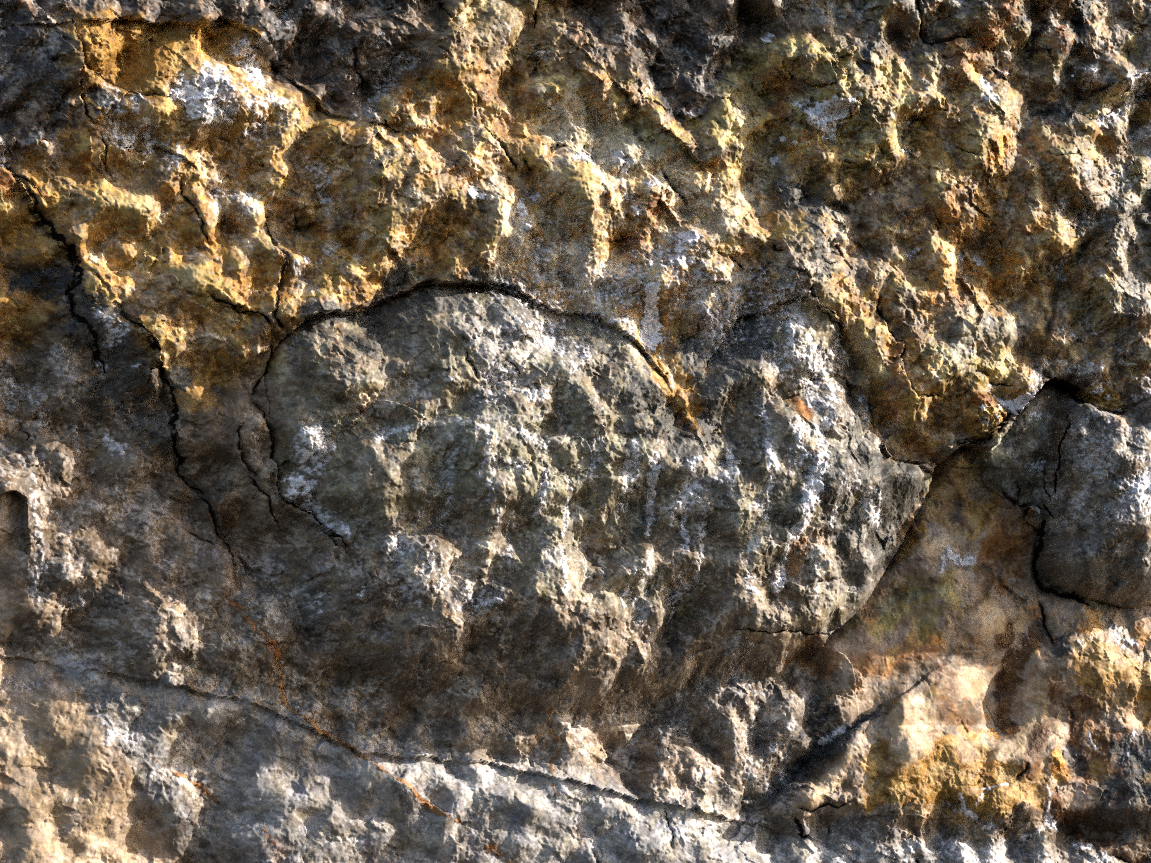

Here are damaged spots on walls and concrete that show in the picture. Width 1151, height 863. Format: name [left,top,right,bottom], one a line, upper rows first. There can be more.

crack [0,163,105,373]
crack [71,17,171,183]
crack [120,308,237,568]
crack [180,181,209,243]
water stain [211,178,263,220]
crack [211,215,348,553]
water stain [282,424,351,537]
water stain [296,104,928,622]
crack [959,369,1021,445]
crack [1003,374,1128,644]